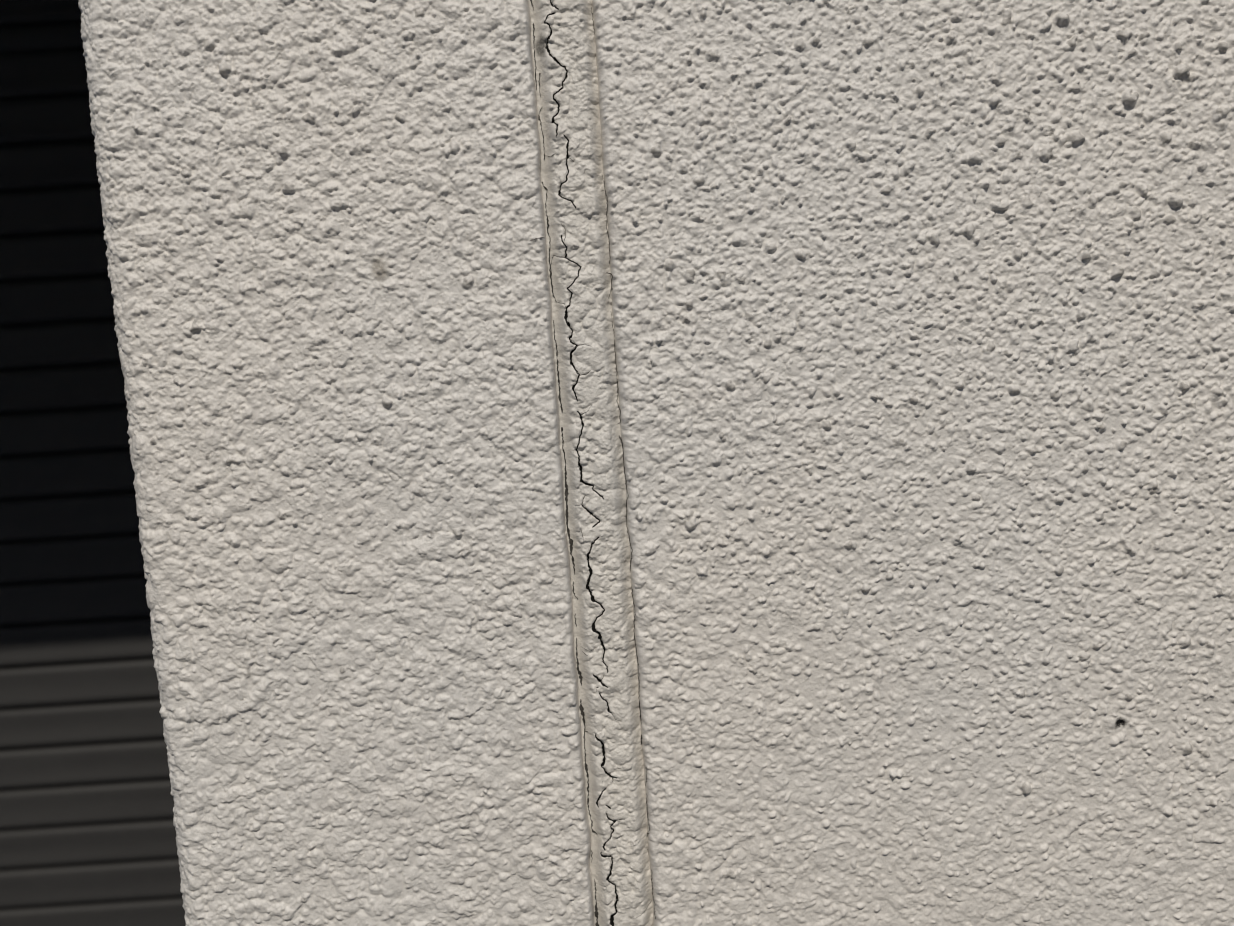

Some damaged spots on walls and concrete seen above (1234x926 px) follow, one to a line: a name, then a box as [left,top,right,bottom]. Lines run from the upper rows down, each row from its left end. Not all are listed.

crack [530,0,656,926]